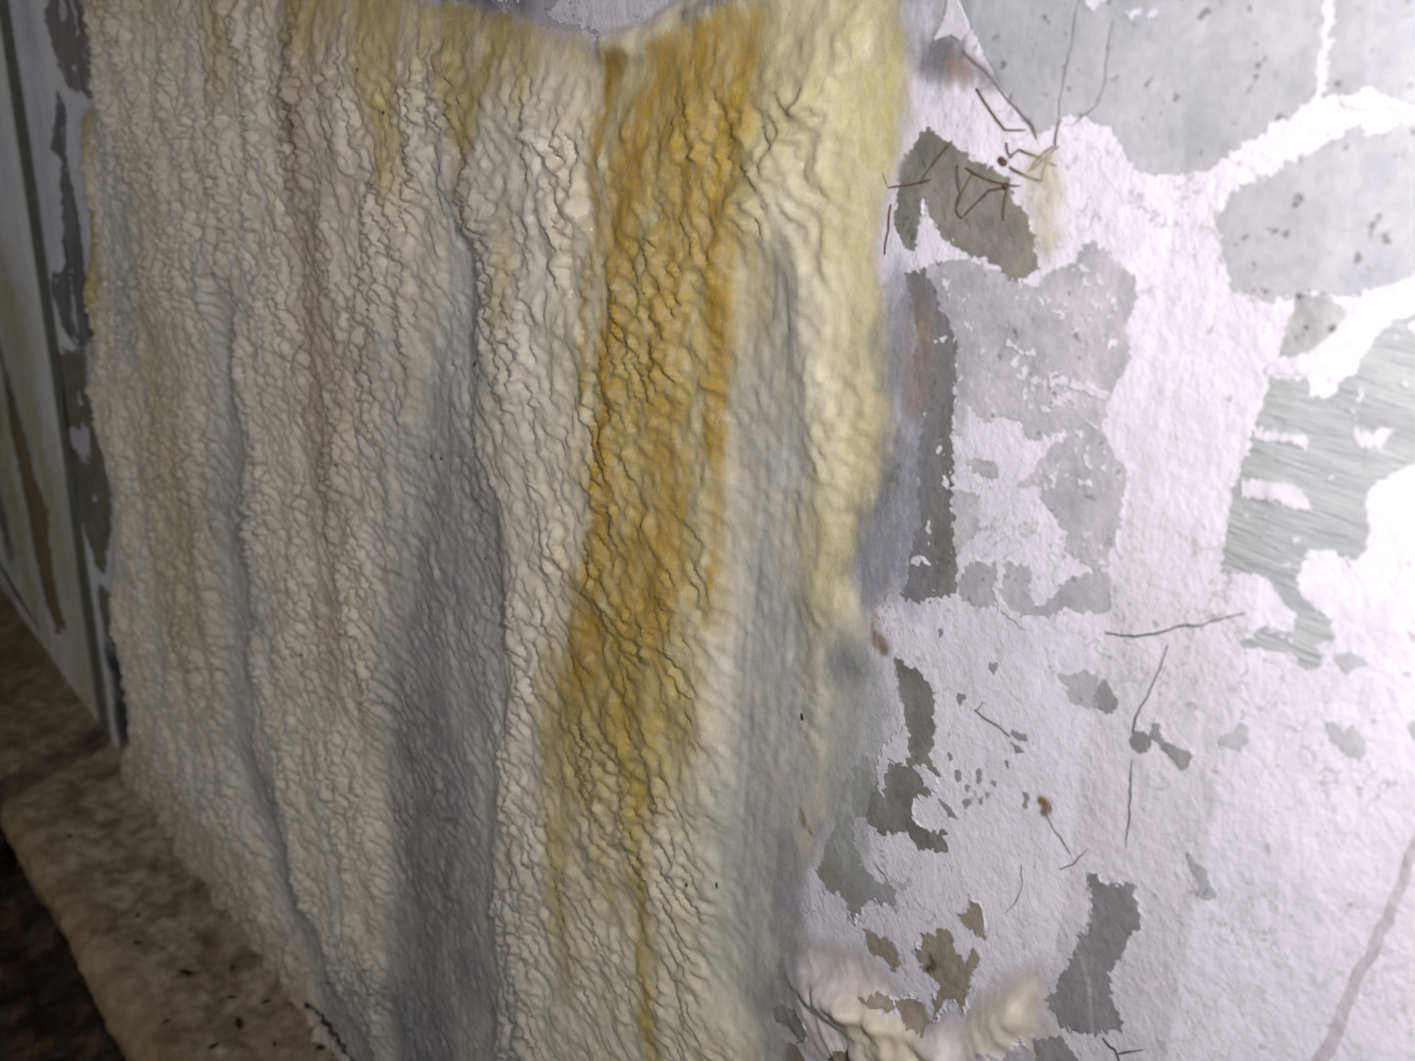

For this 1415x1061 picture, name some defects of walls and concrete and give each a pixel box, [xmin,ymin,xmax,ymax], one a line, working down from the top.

flaking render [44,0,116,650]
water stain [78,0,987,1061]
corrosion [542,4,760,1054]
peeling [764,1004,809,1061]
peeling [815,651,997,1038]
peeling [894,127,1139,630]
peeling [976,870,1147,1061]
peeling [1049,665,1118,714]
peeling [1129,716,1196,771]
peeling [934,0,1415,358]
peeling [1219,313,1415,675]
crack [1311,835,1415,1061]